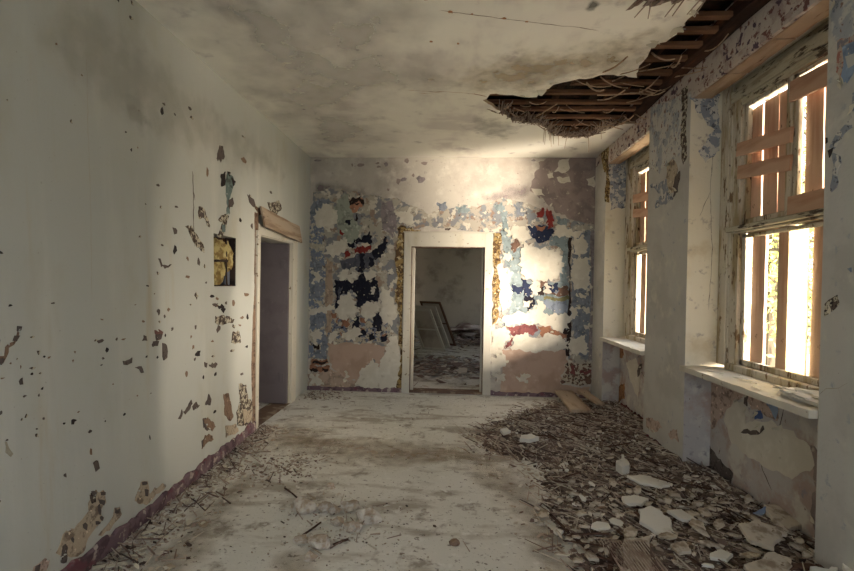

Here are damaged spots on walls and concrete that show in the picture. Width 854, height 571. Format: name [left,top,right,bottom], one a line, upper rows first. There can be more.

peeling [829,0,854,90]
peeling [648,85,721,209]
peeling [825,92,854,193]
peeling [173,172,282,449]
peeling [308,203,421,392]
peeling [490,147,626,383]
peeling [0,326,42,397]
peeling [619,348,642,402]
peeling [32,490,122,571]
peeling [135,481,167,505]
peeling [708,382,817,540]